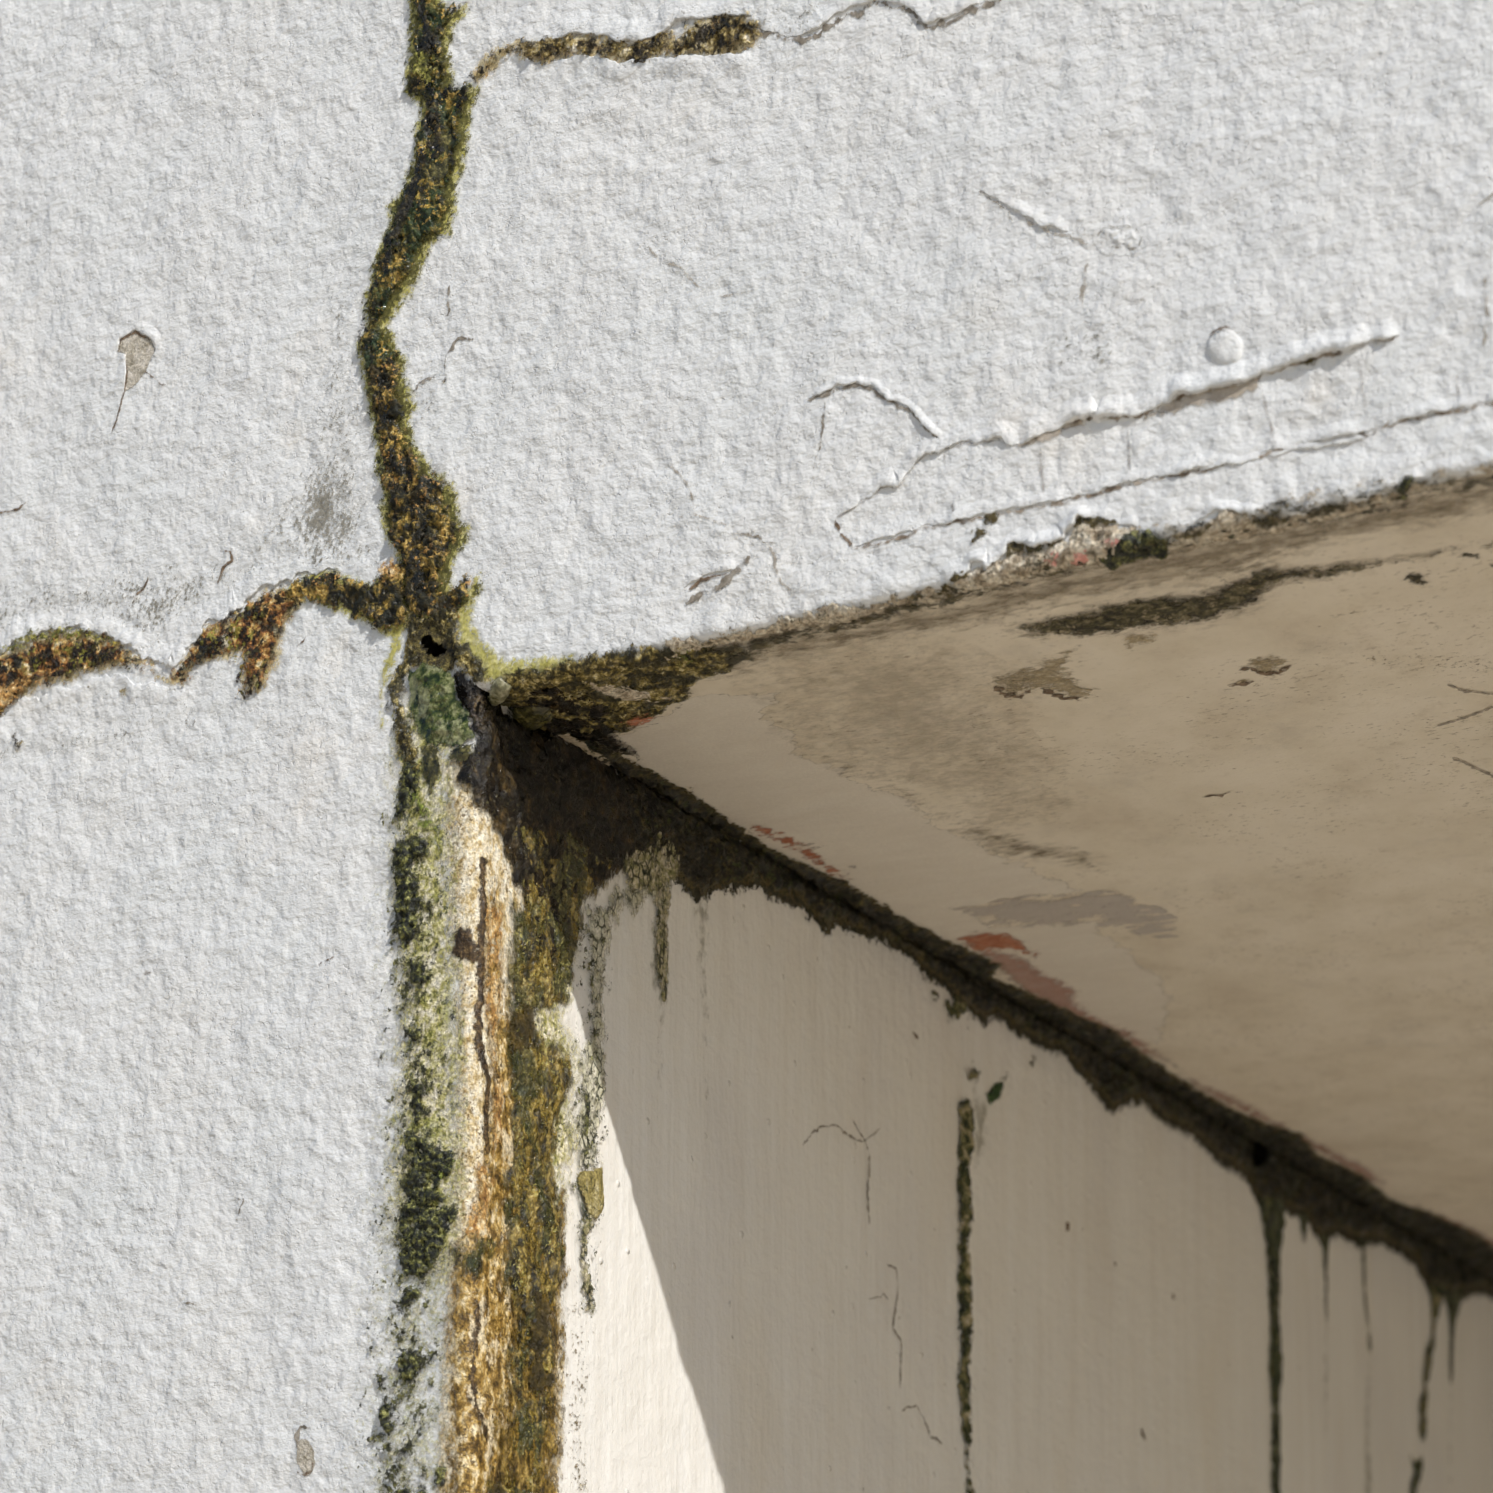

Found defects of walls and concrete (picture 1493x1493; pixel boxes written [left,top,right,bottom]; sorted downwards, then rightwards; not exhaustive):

crack [979,185,1088,244]
crack [0,0,1001,763]
peeling [661,312,1493,660]
peeling [1232,656,1291,687]
crack [1438,685,1493,726]
crack [1453,759,1493,778]
damp [456,703,1493,1493]